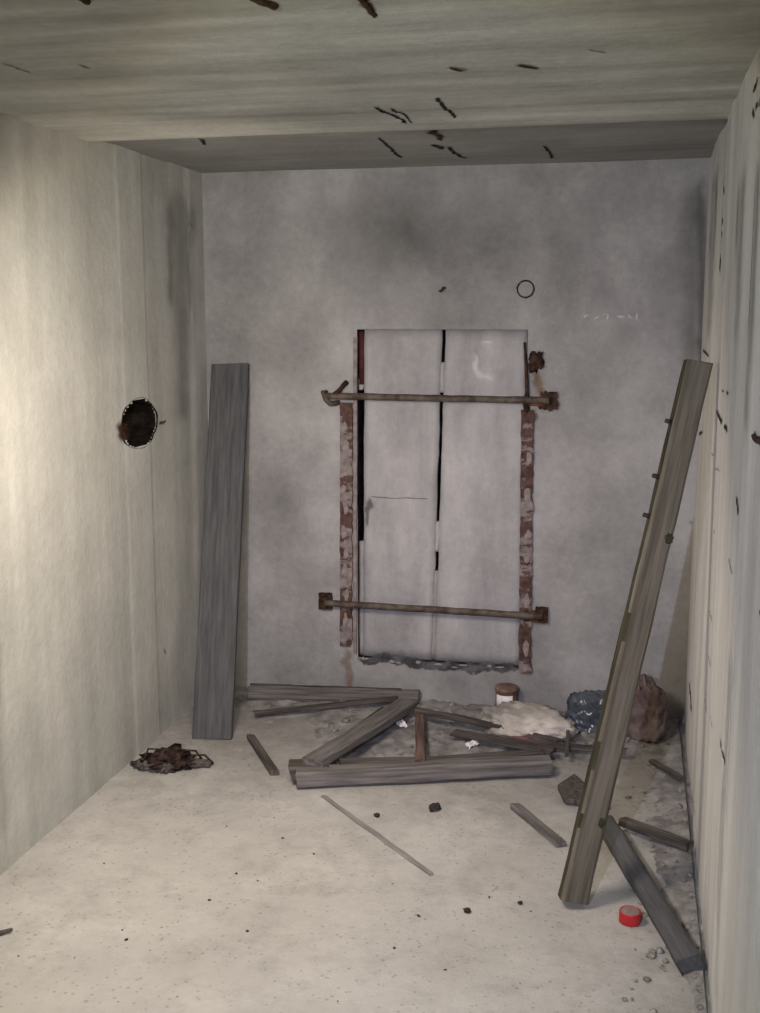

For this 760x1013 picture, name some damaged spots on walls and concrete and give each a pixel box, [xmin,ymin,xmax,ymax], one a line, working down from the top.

hole [117,397,166,449]